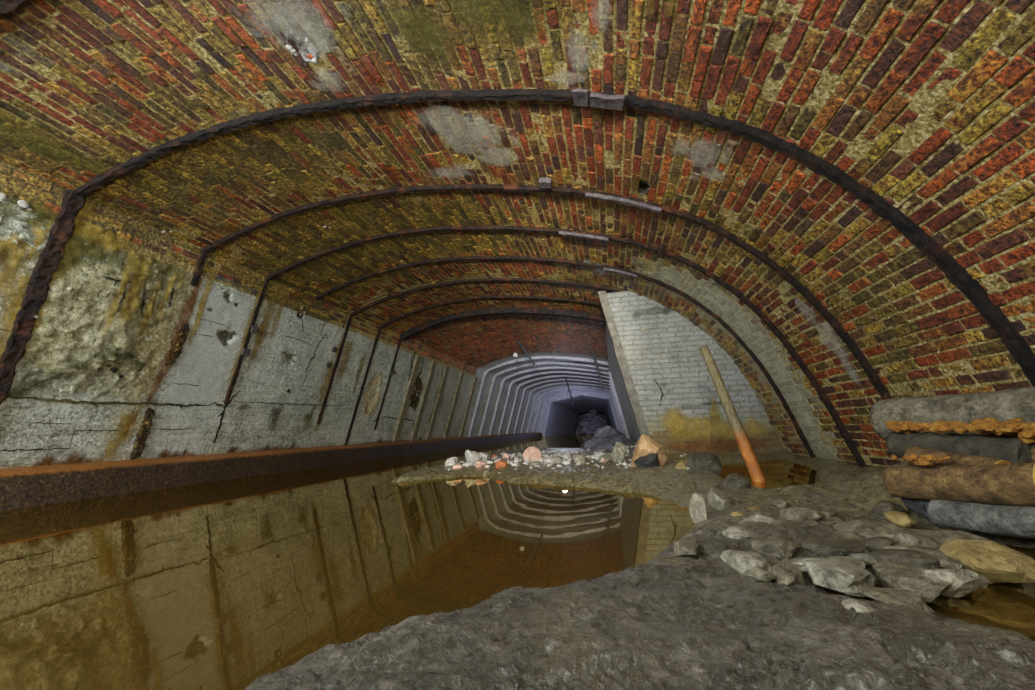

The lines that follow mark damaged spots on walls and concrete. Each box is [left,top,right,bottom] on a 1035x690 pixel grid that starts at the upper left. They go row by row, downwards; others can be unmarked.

rust [0,297,25,357]
leakage [75,220,187,337]
crack [0,317,338,451]
leakage [663,400,734,440]